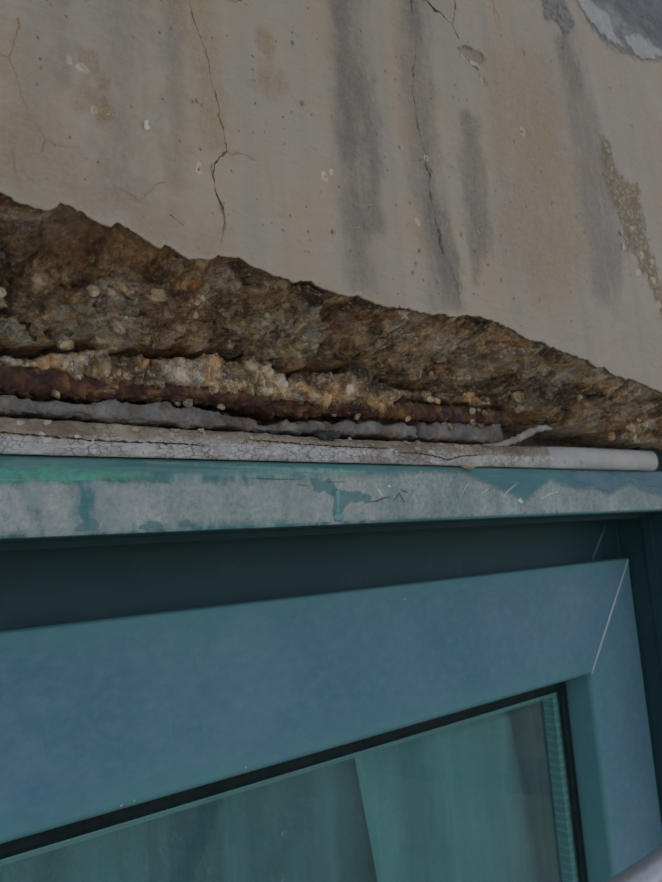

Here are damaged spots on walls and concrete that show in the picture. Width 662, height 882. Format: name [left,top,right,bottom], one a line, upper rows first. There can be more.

crack [0,17,64,153]
crack [173,0,253,241]
crack [410,0,459,39]
crack [412,41,460,302]
peeling [543,0,575,35]
peeling [578,0,662,59]
peeling [601,137,662,314]
spalling [0,194,662,532]